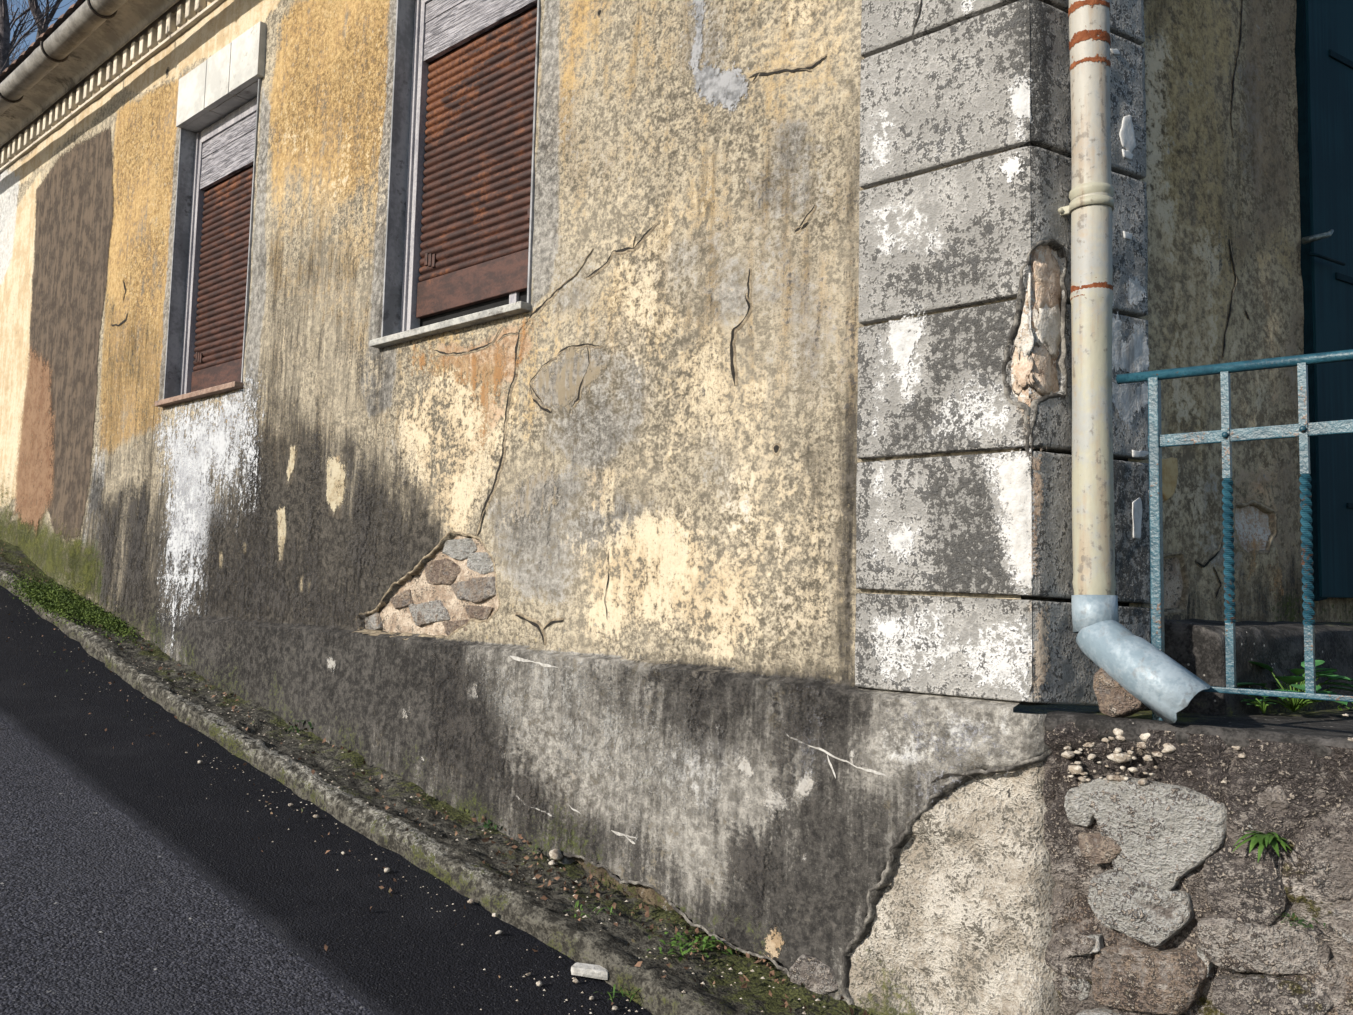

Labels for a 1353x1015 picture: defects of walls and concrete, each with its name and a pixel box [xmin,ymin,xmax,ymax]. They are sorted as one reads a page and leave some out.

crack [1231,0,1243,138]
crack [1223,240,1250,358]
crack [433,222,658,536]
spalling [995,239,1068,588]
spalling [352,530,501,640]
spalling [1033,602,1051,700]
crack [517,796,581,817]
crack [611,830,636,844]
damp [422,633,828,948]
crack [787,735,891,779]
crack [931,773,980,783]